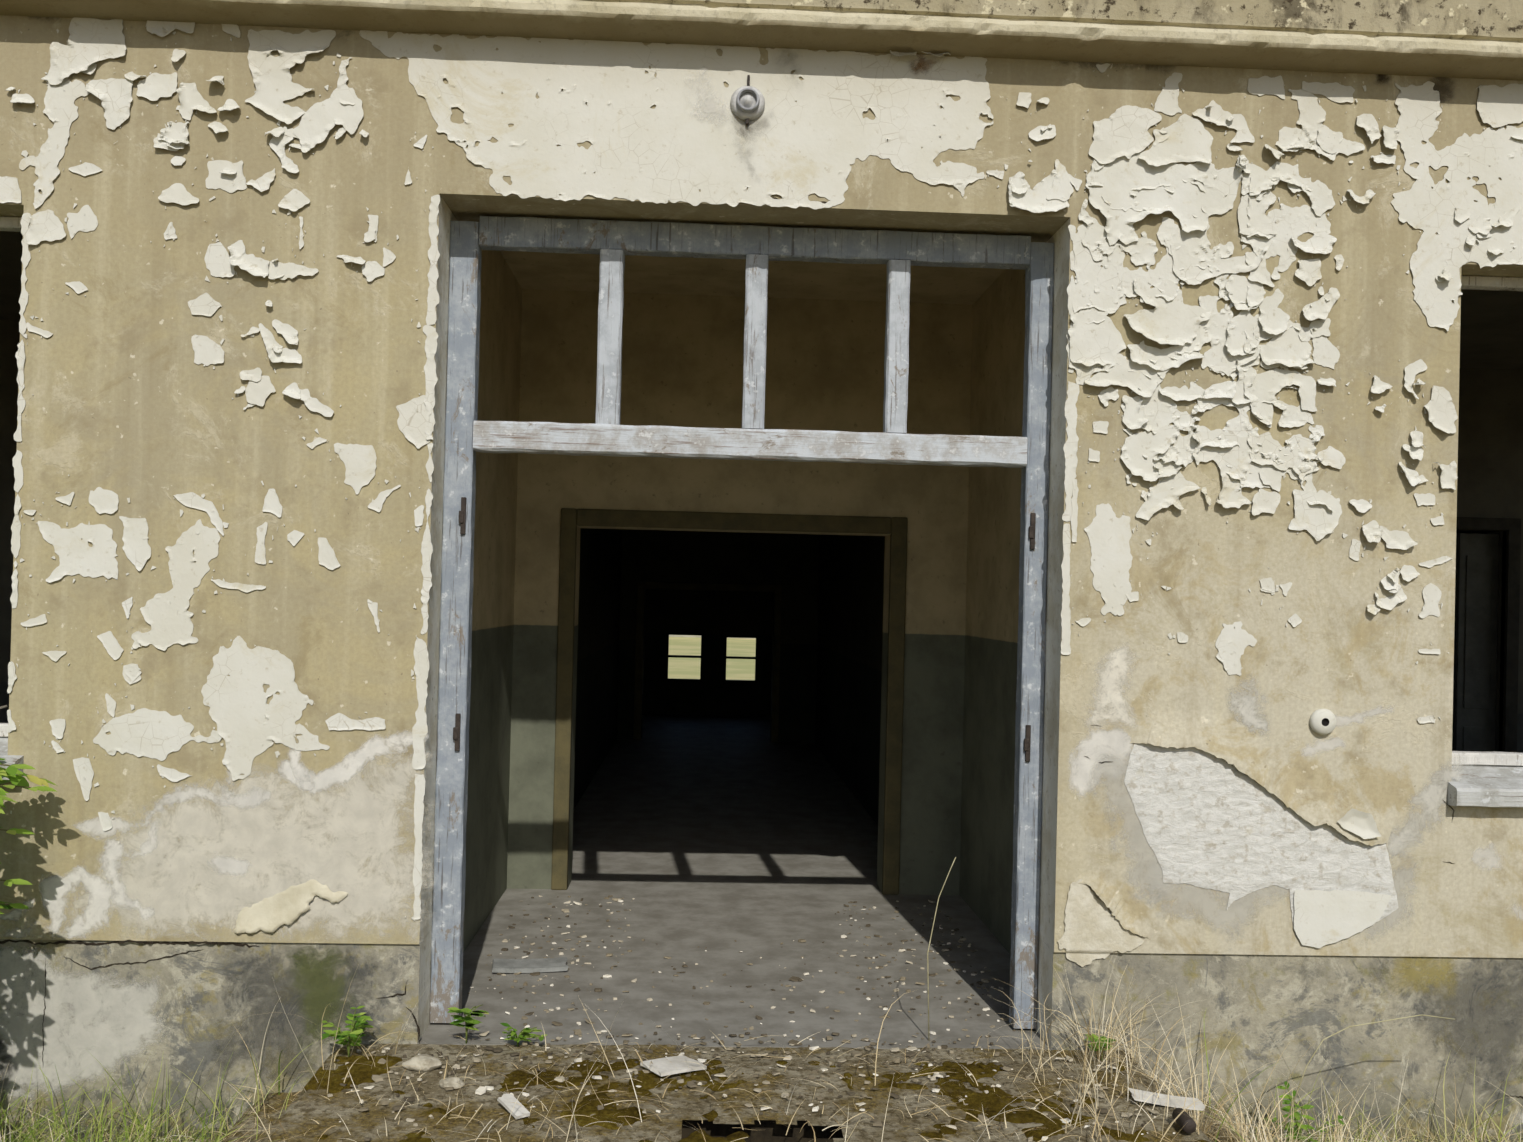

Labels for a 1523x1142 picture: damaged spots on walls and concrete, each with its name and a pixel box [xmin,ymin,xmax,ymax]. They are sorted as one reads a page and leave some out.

peeling [359,30,1523,655]
peeling [0,17,440,921]
peeling [1215,621,1259,676]
peeling [1416,642,1449,664]
leakage [0,732,428,1097]
spalling [1058,869,1154,967]
spalling [1124,709,1398,948]